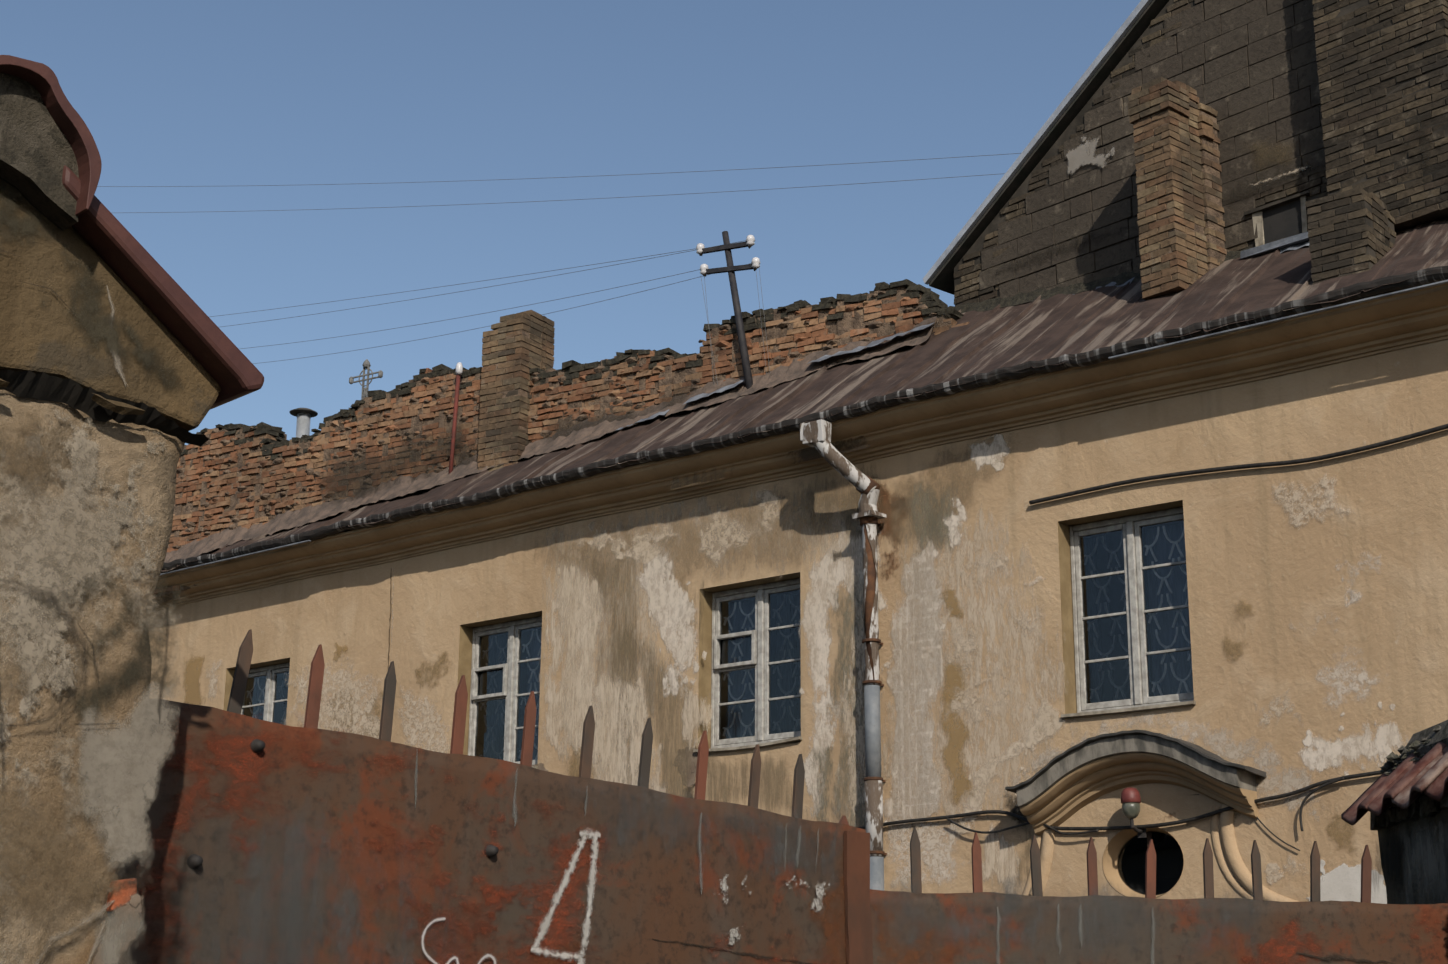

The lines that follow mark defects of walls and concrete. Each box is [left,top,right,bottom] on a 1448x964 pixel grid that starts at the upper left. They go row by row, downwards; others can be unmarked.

flaking render [1066,137,1115,174]
crack [0,370,209,446]
leakage [789,436,869,464]
flaking render [970,434,1009,471]
leakage [553,450,989,797]
leakage [816,588,866,853]
flaking render [1081,663,1401,814]
flaking render [60,683,178,964]
corrosion [406,829,606,964]
leakage [699,757,792,894]
flaking render [1308,816,1387,904]